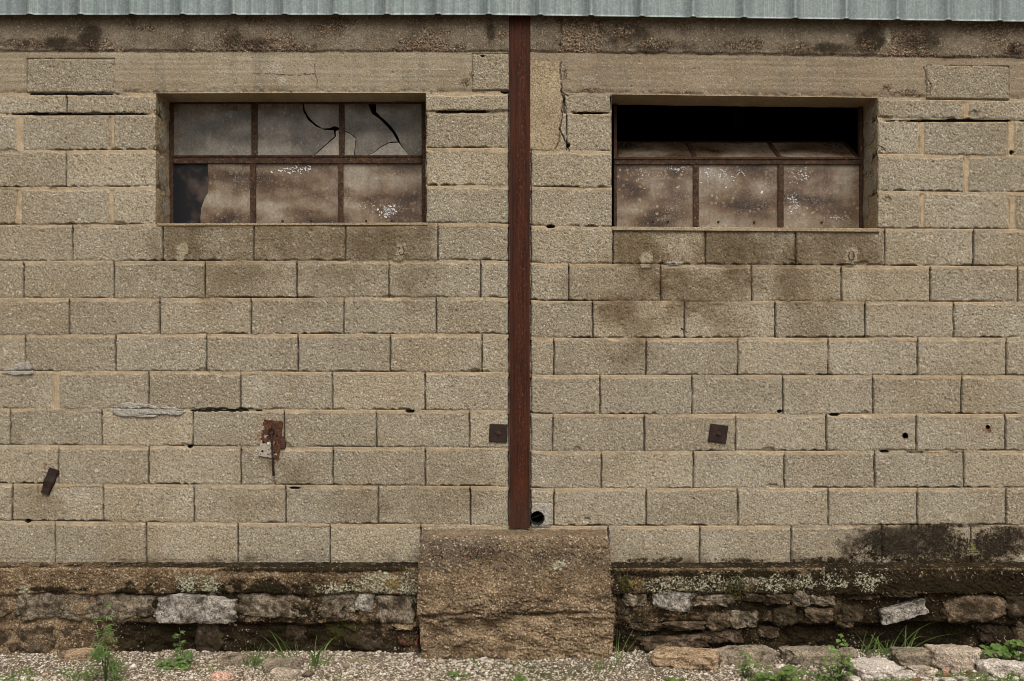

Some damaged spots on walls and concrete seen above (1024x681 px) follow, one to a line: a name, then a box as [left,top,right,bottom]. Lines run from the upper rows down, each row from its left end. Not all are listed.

damp [24,25,101,51]
damp [223,29,268,49]
crack [551,18,570,152]
damp [791,522,1024,563]